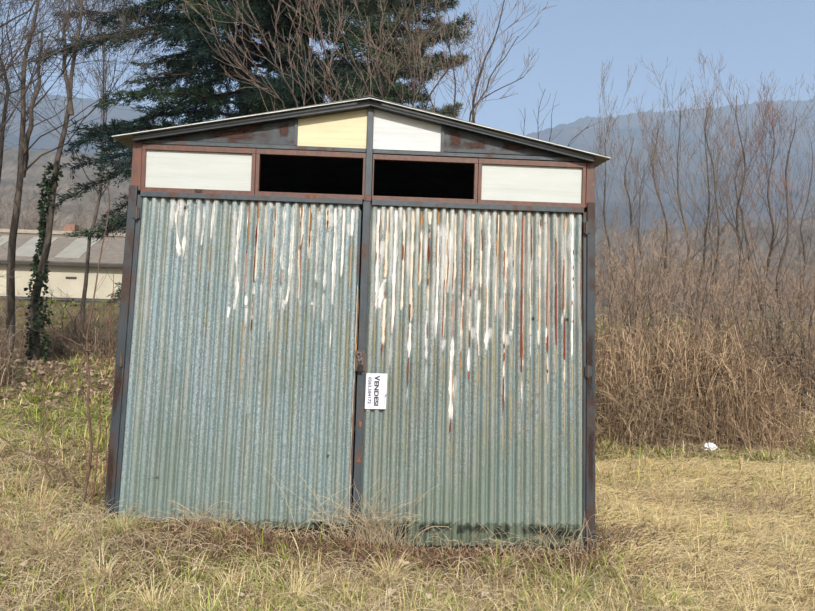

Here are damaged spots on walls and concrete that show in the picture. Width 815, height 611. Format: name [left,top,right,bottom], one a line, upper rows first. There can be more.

corrosion [212,125,262,139]
peeling [170,198,215,337]
peeling [227,202,304,475]
corrosion [306,194,315,283]
peeling [373,207,517,497]
corrosion [520,212,532,416]
peeling [536,213,550,470]